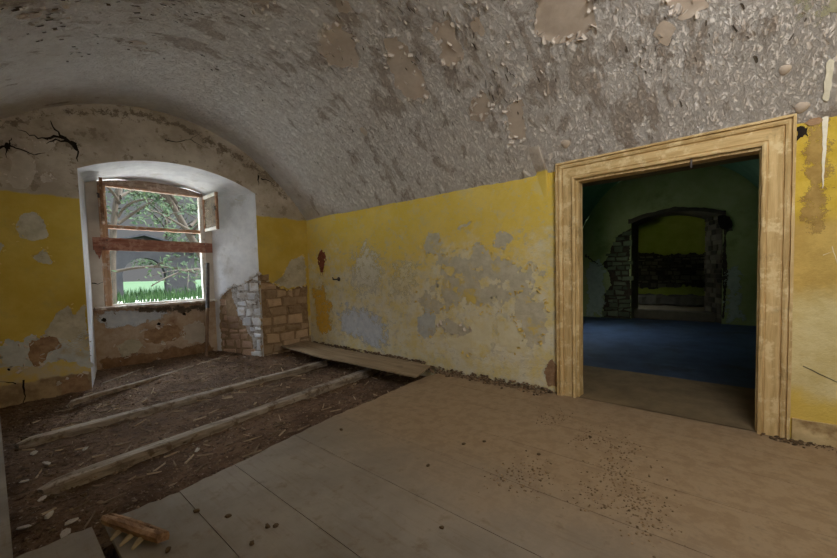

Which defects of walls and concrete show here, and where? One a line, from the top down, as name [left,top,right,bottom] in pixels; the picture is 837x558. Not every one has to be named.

flaking render [517,0,598,54]
crack [0,121,81,161]
peeling [12,212,55,264]
flaking render [219,254,310,357]
peeling [415,231,551,349]
peeling [0,303,94,395]
flaking render [113,312,205,362]
flaking render [544,359,557,387]